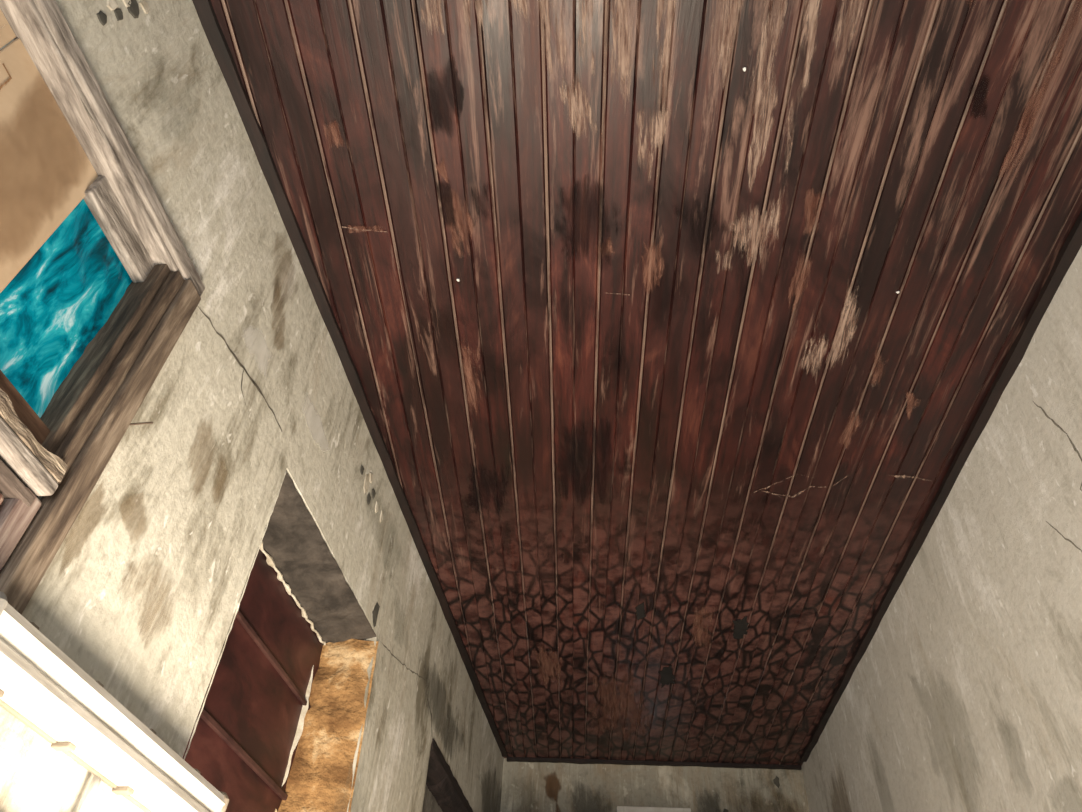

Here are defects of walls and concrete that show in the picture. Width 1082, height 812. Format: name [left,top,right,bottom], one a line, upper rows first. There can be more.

peeling [834,0,864,62]
peeling [559,78,597,137]
peeling [637,0,675,181]
peeling [748,0,787,186]
peeling [770,188,785,237]
peeling [463,349,480,409]
peeling [801,335,828,377]
crack [1034,403,1082,491]
crack [1046,521,1082,551]